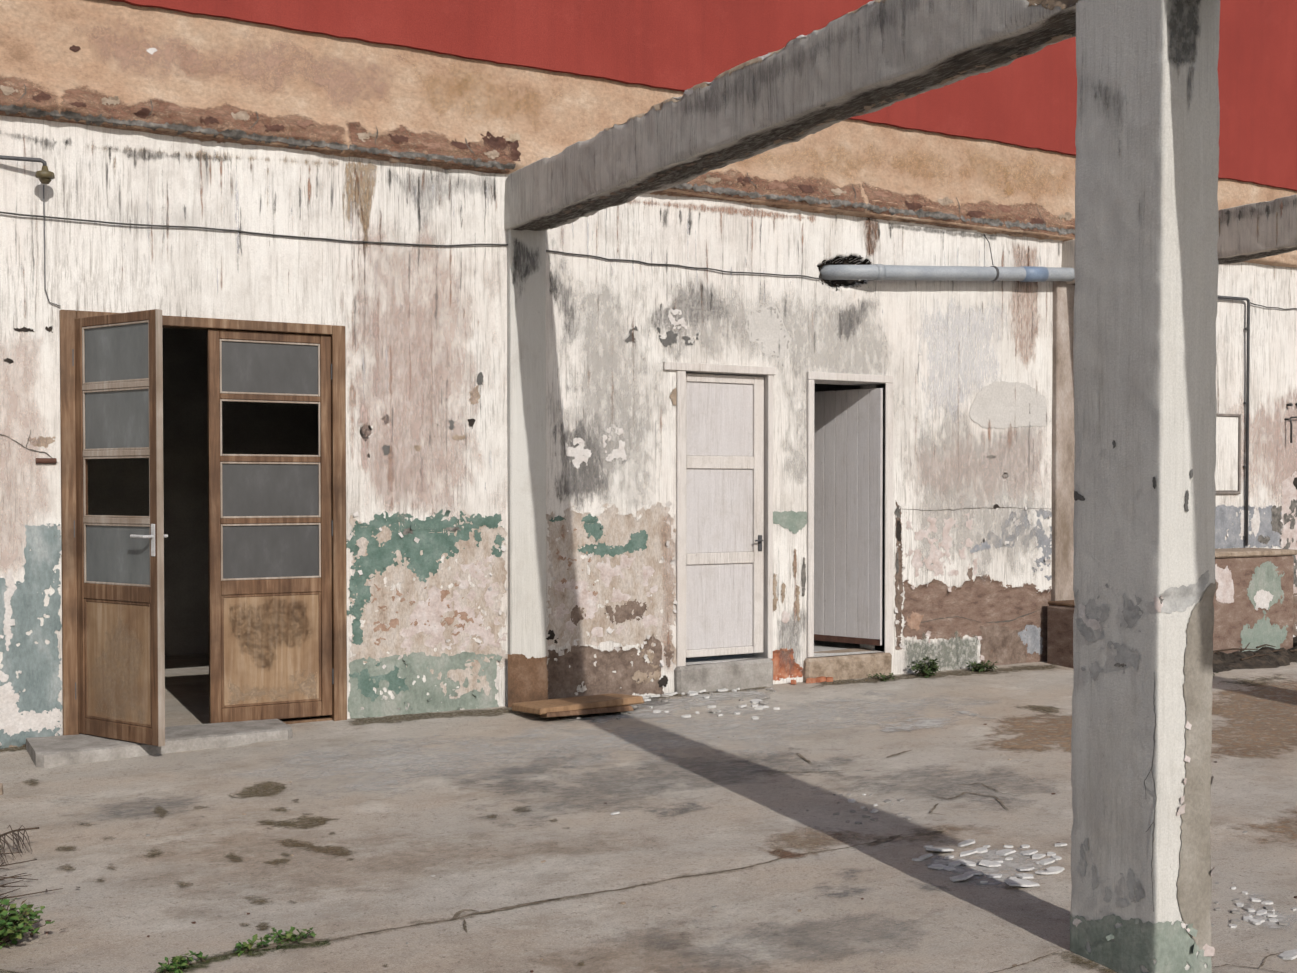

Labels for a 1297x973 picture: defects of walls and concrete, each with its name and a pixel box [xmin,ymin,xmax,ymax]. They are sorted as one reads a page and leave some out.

water stain [128,149,226,213]
spalling [0,77,521,174]
spalling [605,0,886,131]
water stain [654,269,715,348]
water stain [839,302,868,339]
spalling [27,436,56,448]
water stain [555,423,627,502]
peeling [0,523,63,749]
spalling [346,501,807,720]
spalling [894,502,1052,666]
peeling [1215,471,1297,596]
peeling [912,570,1217,973]